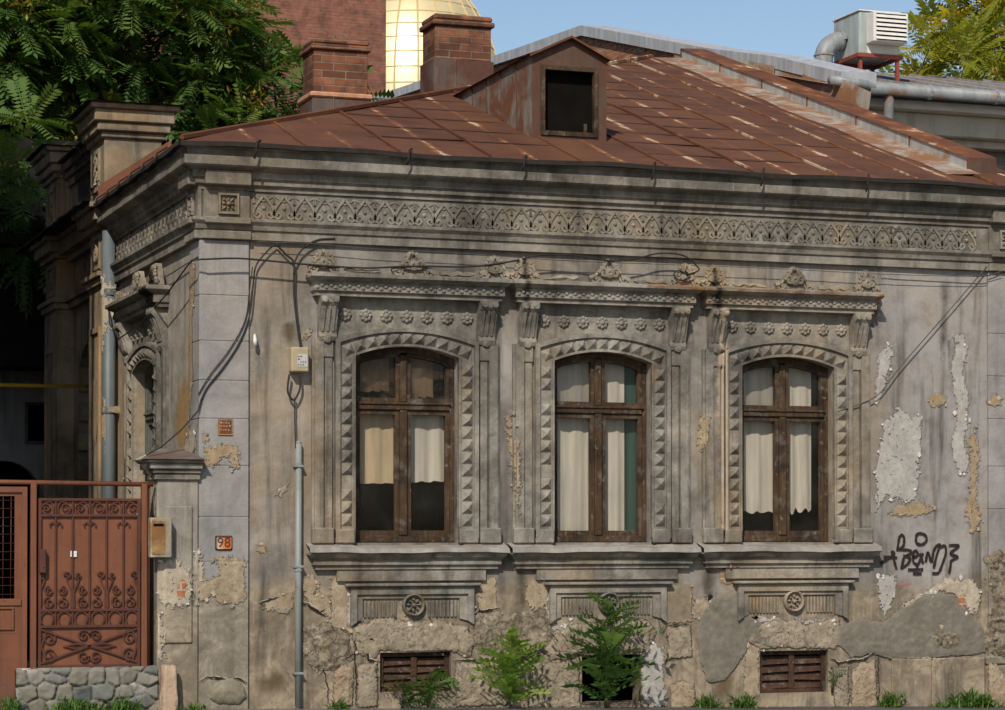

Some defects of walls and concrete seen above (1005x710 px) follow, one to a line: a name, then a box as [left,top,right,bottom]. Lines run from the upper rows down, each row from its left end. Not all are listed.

flaking render [184,262,241,472]
flaking render [873,331,984,535]
flaking render [156,545,248,662]
flaking render [260,572,711,709]
flaking render [742,614,840,701]
flaking render [830,659,878,707]
flaking render [876,549,1005,707]